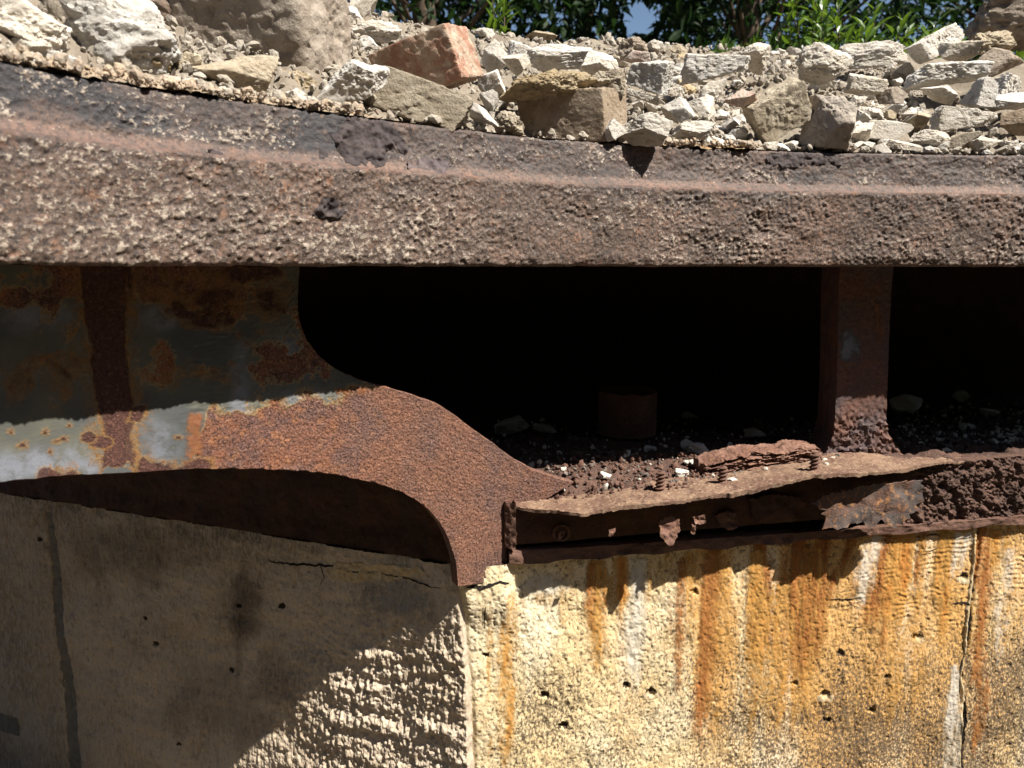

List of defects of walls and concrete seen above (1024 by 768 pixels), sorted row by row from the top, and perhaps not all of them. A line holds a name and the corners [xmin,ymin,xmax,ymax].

rust [6,266,213,478]
rust [154,266,289,344]
crack [269,560,441,589]
rust [486,595,517,765]
rust [585,556,630,667]
rust [659,510,738,750]
rust [741,480,955,731]
crack [914,527,982,768]
rust [972,528,1017,747]